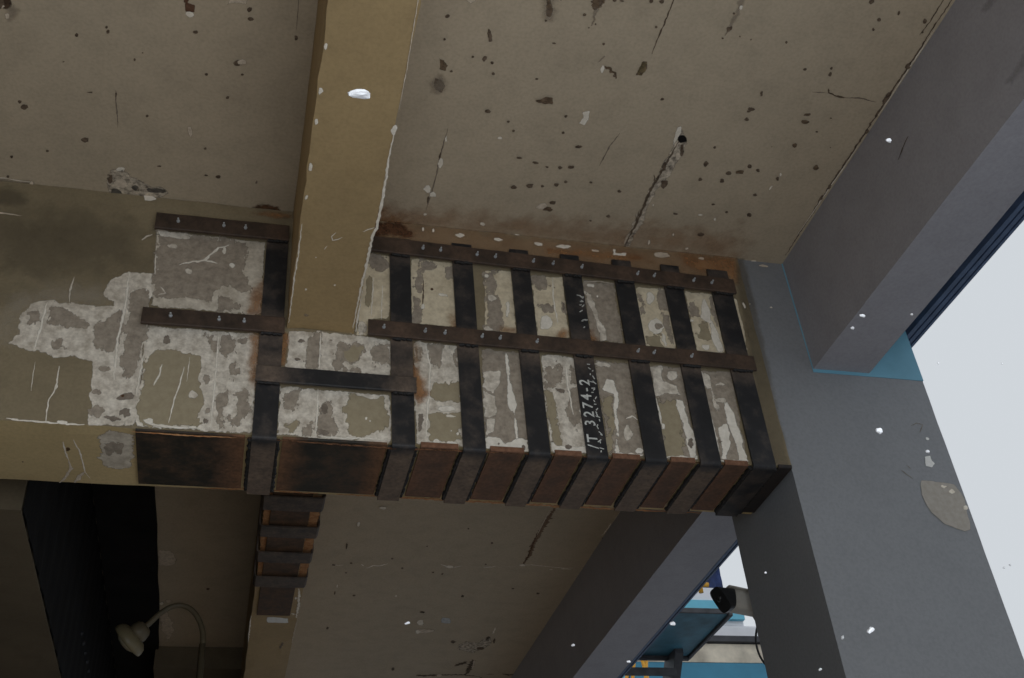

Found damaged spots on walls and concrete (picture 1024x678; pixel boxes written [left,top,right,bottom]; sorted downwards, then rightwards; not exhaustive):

crack [613,126,687,256]
rust [374,211,416,239]
peeling [921,480,970,531]